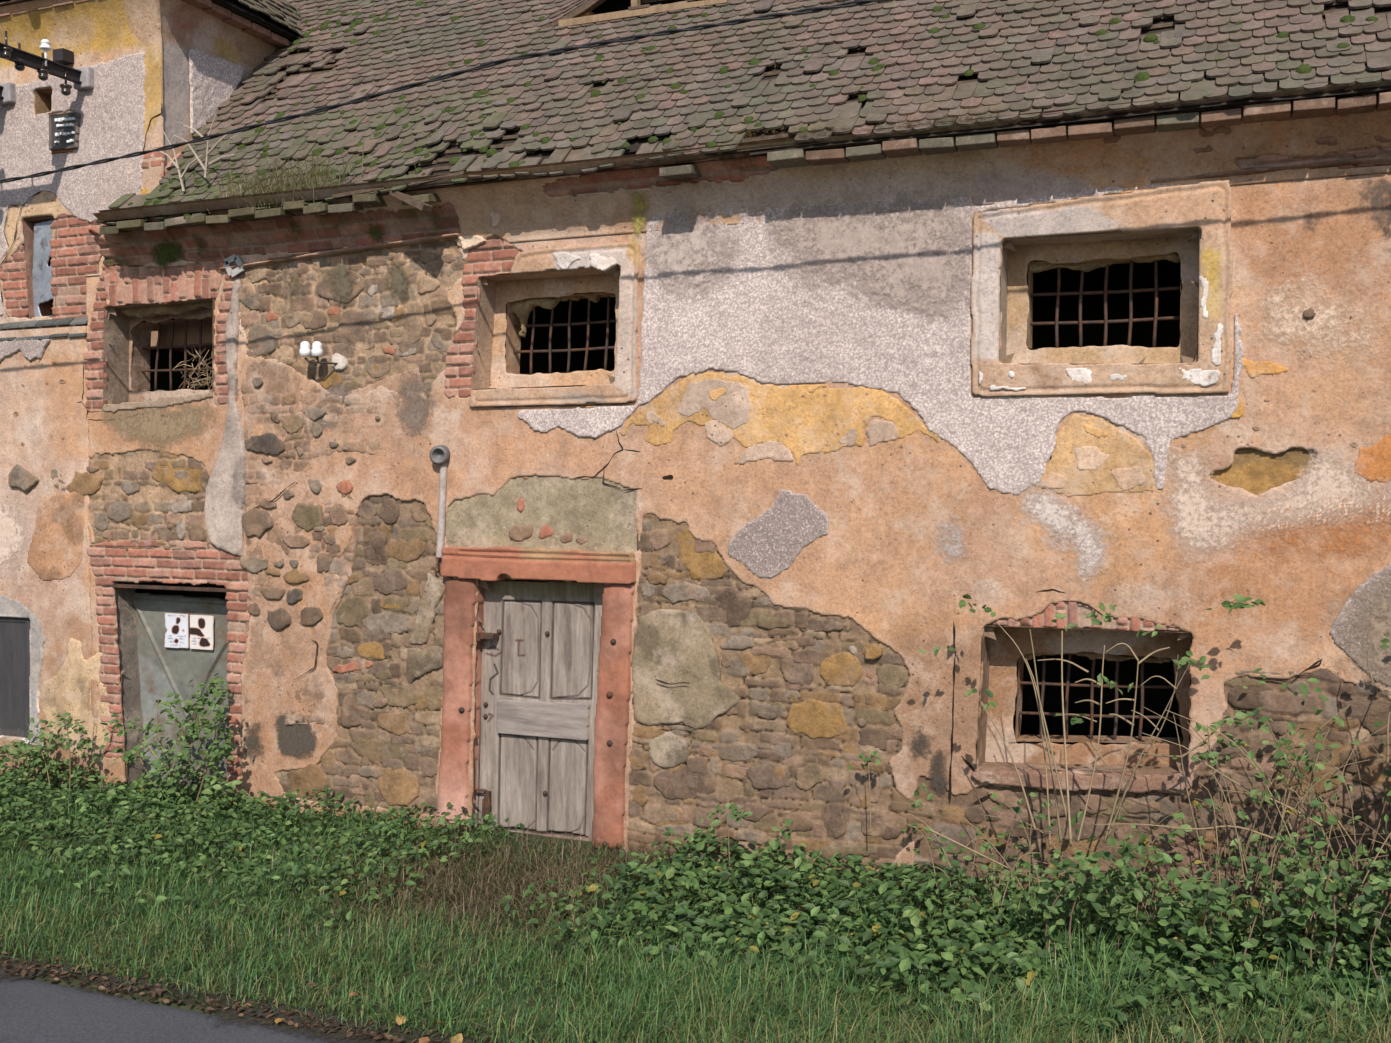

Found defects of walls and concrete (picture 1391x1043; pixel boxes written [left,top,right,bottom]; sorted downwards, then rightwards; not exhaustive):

mould [1360,179,1391,239]
flaking render [244,432,285,455]
flaking render [49,203,523,413]
peeling [553,252,618,272]
peeling [619,372,941,480]
peeling [1066,368,1092,385]
peeling [1032,414,1154,497]
peeling [1178,275,1288,387]
flaking render [1210,396,1320,495]
peeling [1328,433,1391,483]
flaking render [8,450,291,804]
flaking render [275,475,1391,915]